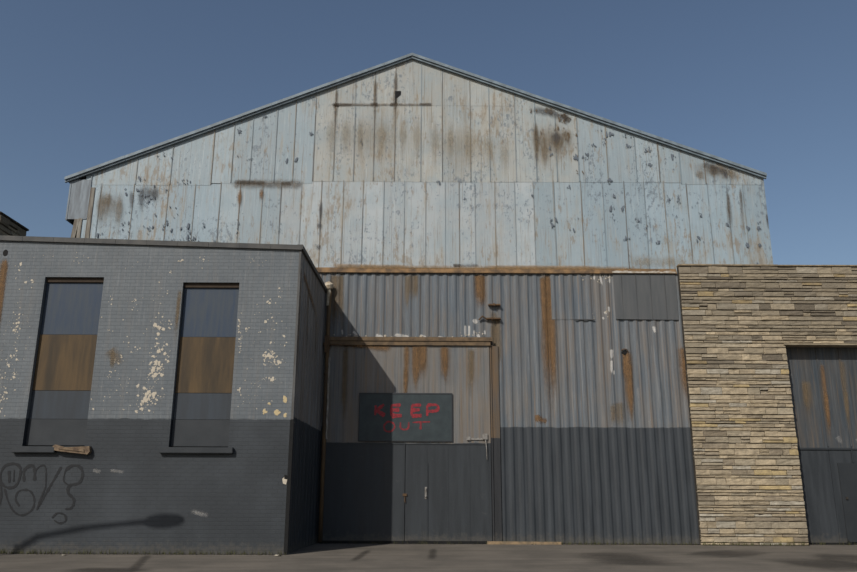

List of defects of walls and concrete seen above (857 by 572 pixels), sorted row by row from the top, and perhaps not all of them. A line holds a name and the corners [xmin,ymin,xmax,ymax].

peeling [0,307,30,416]
peeling [107,282,172,414]
peeling [237,312,287,407]
corrosion [404,345,426,393]
corrosion [336,264,630,375]
corrosion [621,348,633,414]